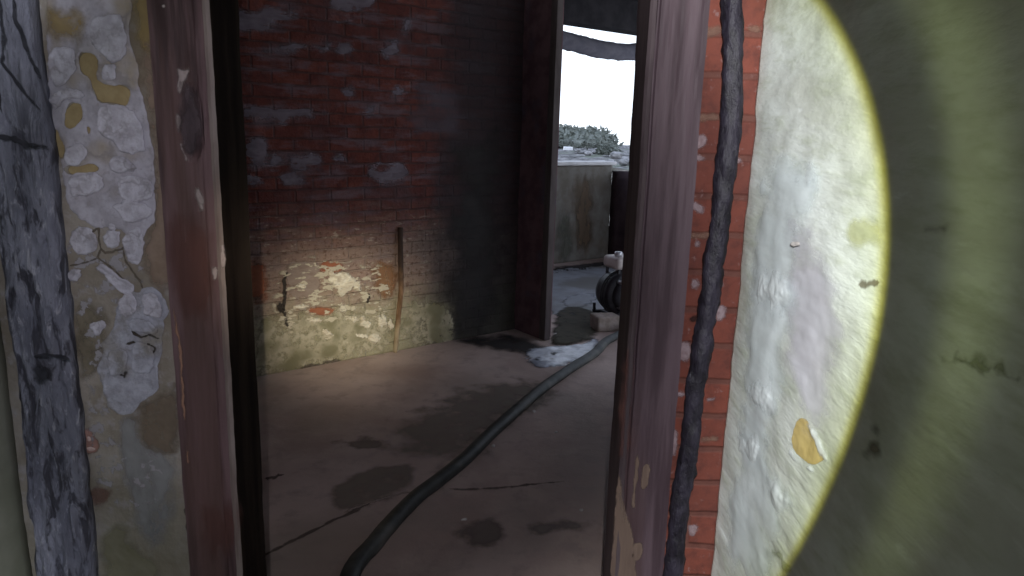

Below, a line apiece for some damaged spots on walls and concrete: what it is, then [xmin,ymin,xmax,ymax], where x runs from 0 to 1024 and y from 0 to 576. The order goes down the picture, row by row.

peeling [177,69,189,92]
crack [70,227,142,287]
peeling [46,0,185,507]
peeling [251,257,394,350]
peeling [730,167,841,576]
leakage [334,465,412,508]
crack [454,482,555,490]